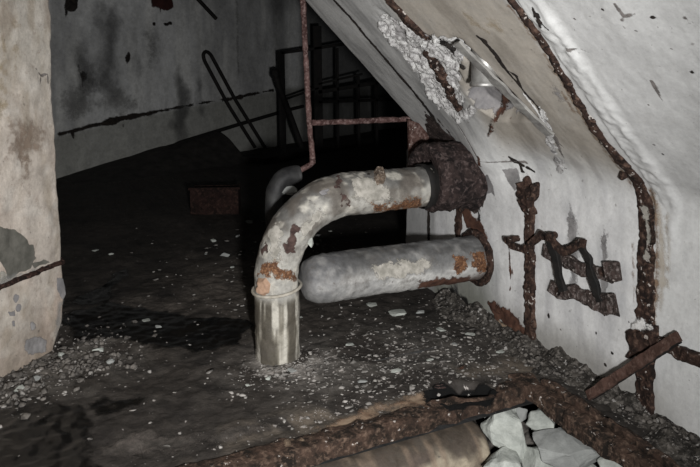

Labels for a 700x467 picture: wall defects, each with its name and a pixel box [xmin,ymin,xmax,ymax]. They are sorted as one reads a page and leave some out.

peeling [0,227,49,284]
rust [649,189,667,309]
rust [0,257,65,290]
rust [488,301,525,334]
rust [668,345,700,368]
rust [329,393,426,427]